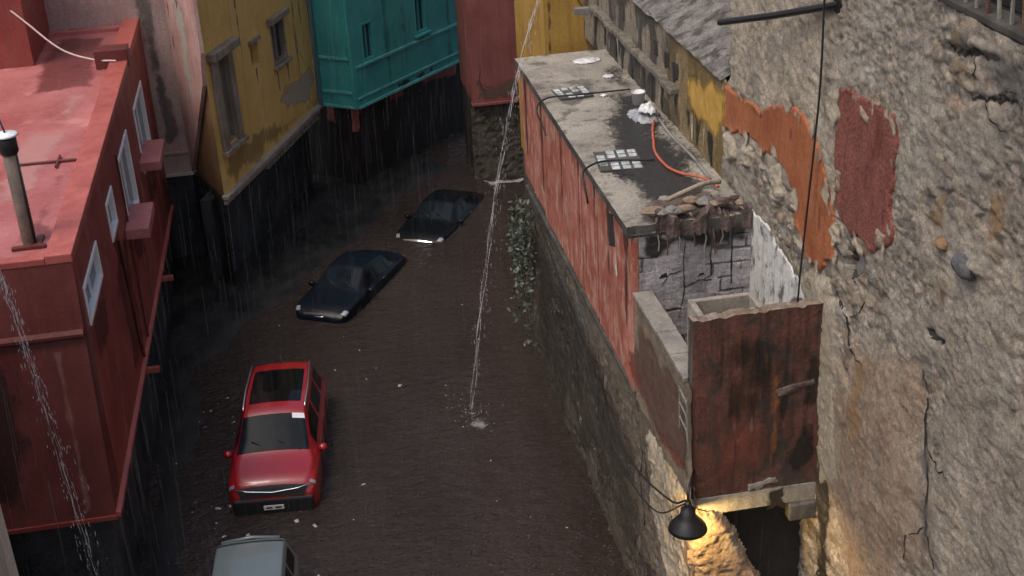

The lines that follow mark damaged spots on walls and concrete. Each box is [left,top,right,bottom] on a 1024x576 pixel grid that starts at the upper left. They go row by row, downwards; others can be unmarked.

peeling [640,40,900,305]
crack [950,44,1018,132]
crack [660,235,733,317]
crack [903,370,946,569]